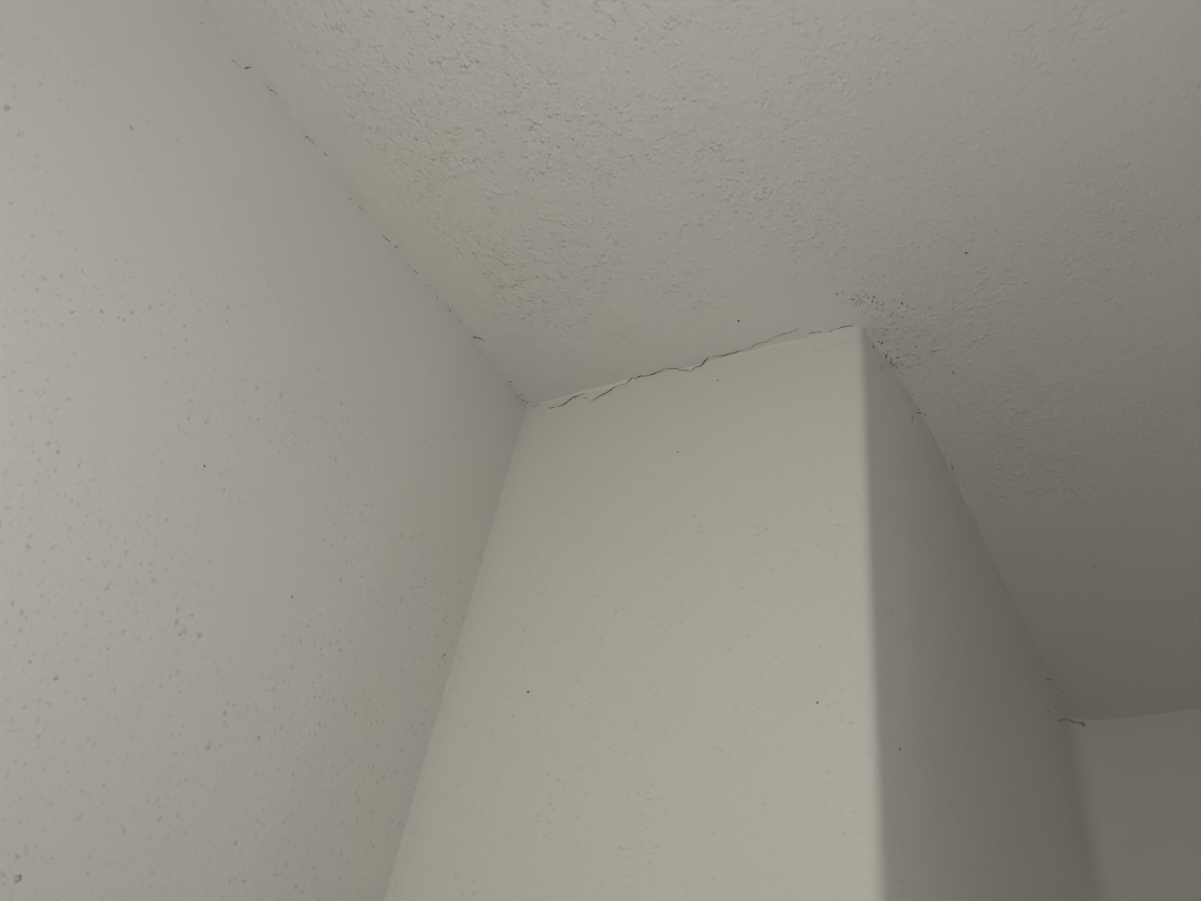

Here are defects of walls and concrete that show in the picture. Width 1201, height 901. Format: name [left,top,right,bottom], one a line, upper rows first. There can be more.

crack [536,325,865,408]